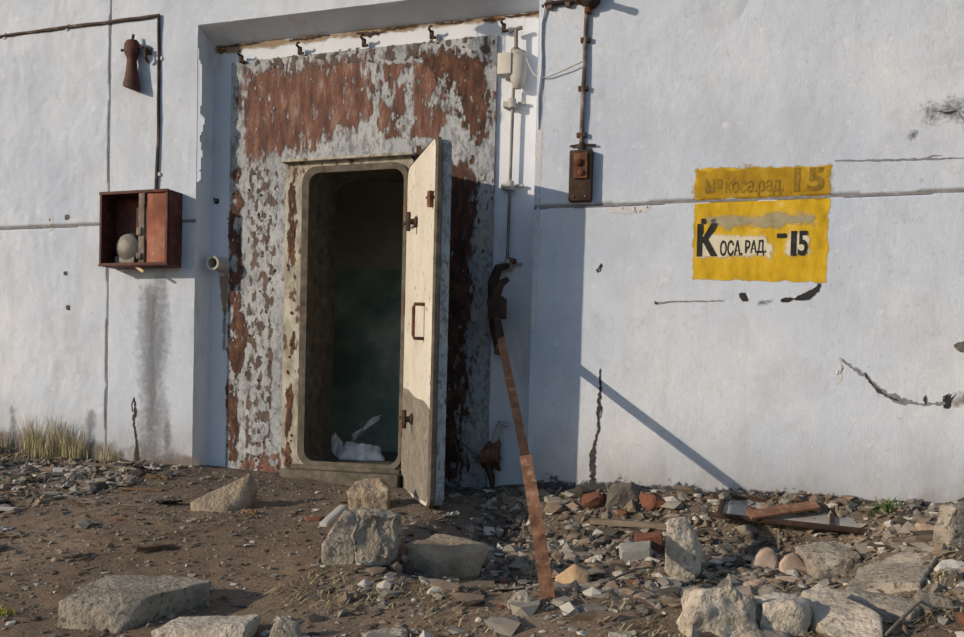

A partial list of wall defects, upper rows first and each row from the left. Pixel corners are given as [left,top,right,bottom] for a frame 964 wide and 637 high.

peeling [225,36,499,502]
crack [588,369,602,485]
crack [839,357,956,406]